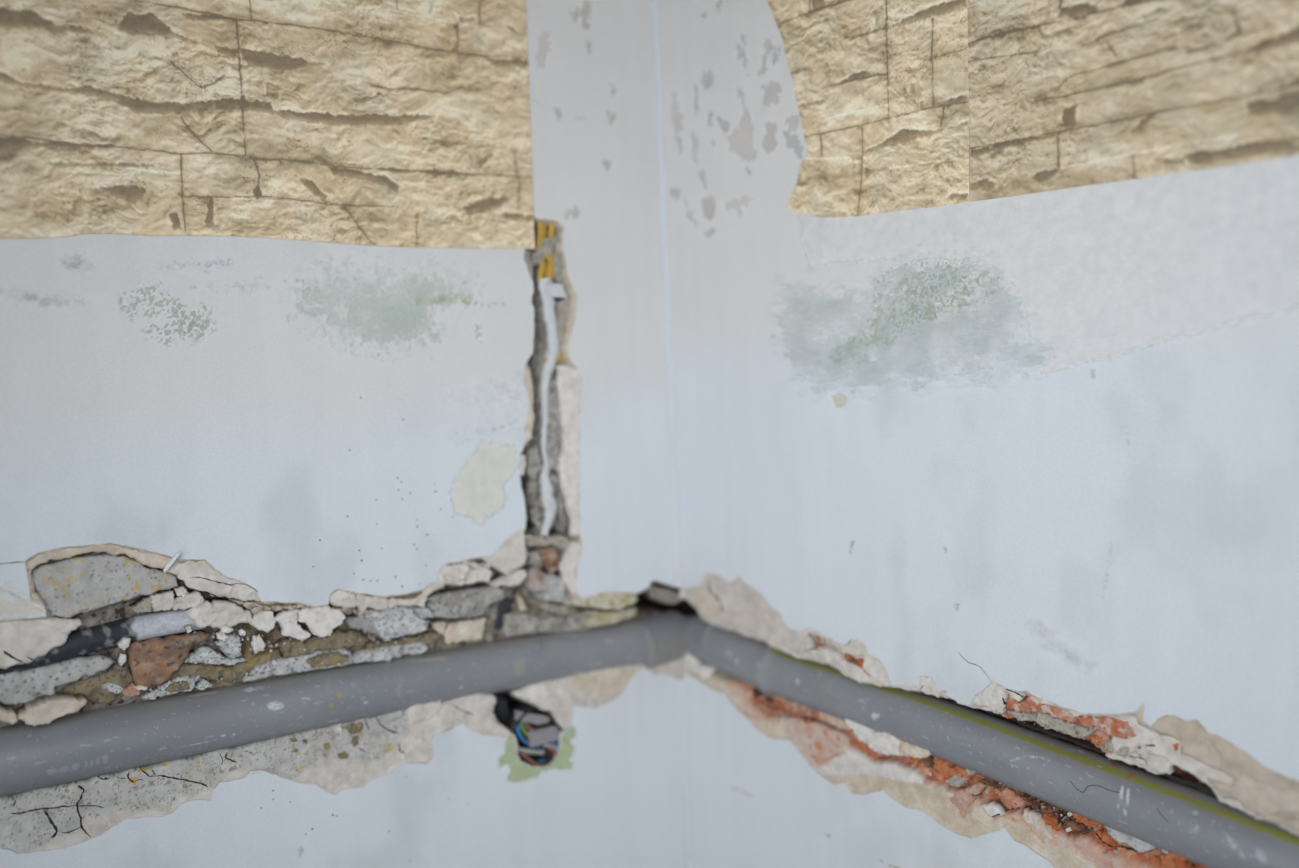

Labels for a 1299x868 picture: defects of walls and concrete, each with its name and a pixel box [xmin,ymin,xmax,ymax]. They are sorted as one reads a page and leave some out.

spalling [0,528,1299,868]